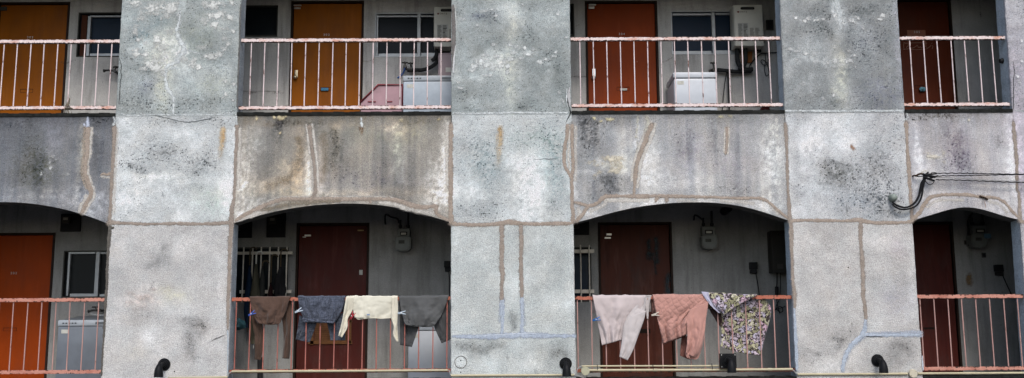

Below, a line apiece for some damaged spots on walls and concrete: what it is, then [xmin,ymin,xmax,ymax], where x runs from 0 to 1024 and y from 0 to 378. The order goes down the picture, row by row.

crack [78,62,1024,372]